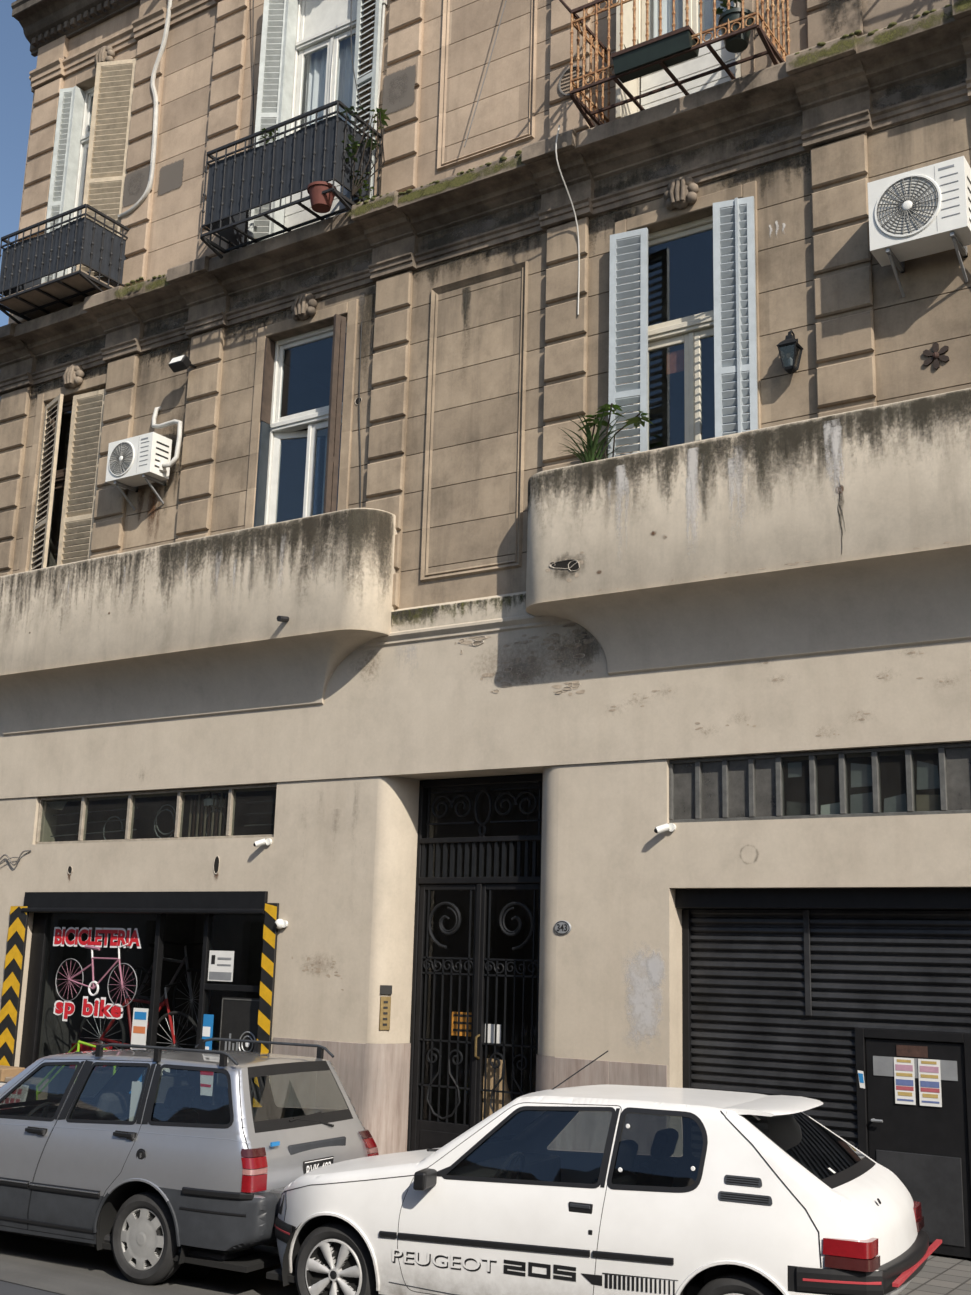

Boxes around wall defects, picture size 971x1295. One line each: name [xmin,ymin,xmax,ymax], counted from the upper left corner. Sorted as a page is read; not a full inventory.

damp [528,389,971,537]
damp [0,554,140,595]
damp [159,508,393,585]
peeling [455,623,594,696]